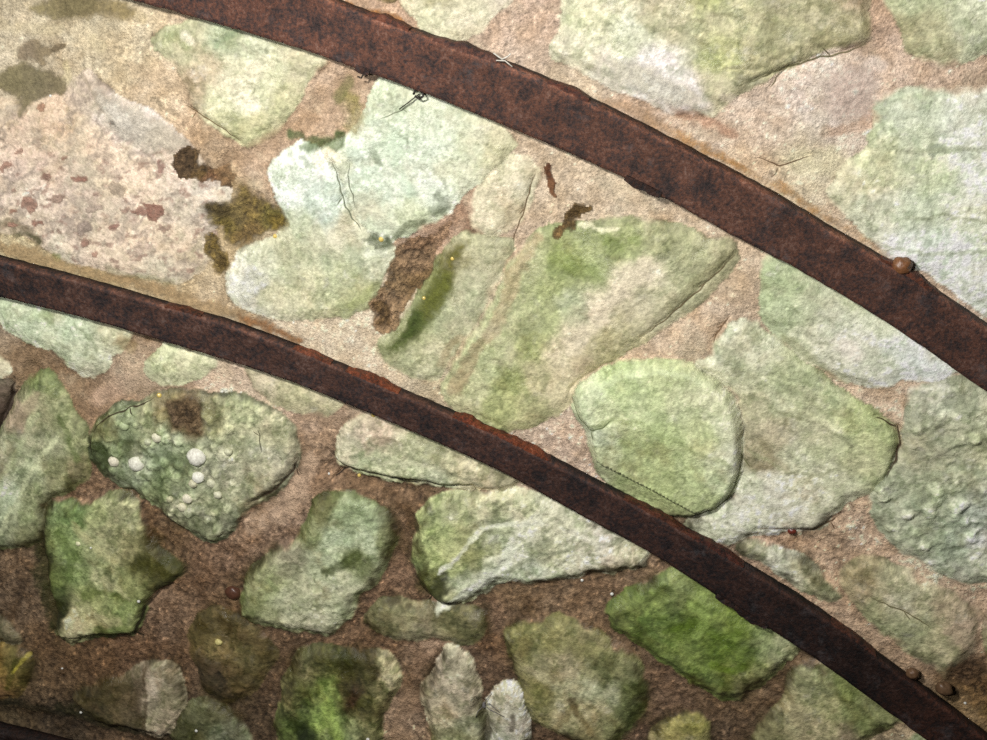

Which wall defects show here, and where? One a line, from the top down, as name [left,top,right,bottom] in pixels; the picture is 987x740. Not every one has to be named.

corrosion [366,12,412,31]
corrosion [432,36,500,64]
corrosion [547,79,590,102]
corrosion [544,163,557,198]
corrosion [624,175,662,198]
corrosion [881,255,939,296]
corrosion [0,244,333,365]
corrosion [345,367,401,394]
corrosion [452,412,551,462]
corrosion [623,494,744,568]
corrosion [715,593,769,629]
corrosion [831,617,876,656]